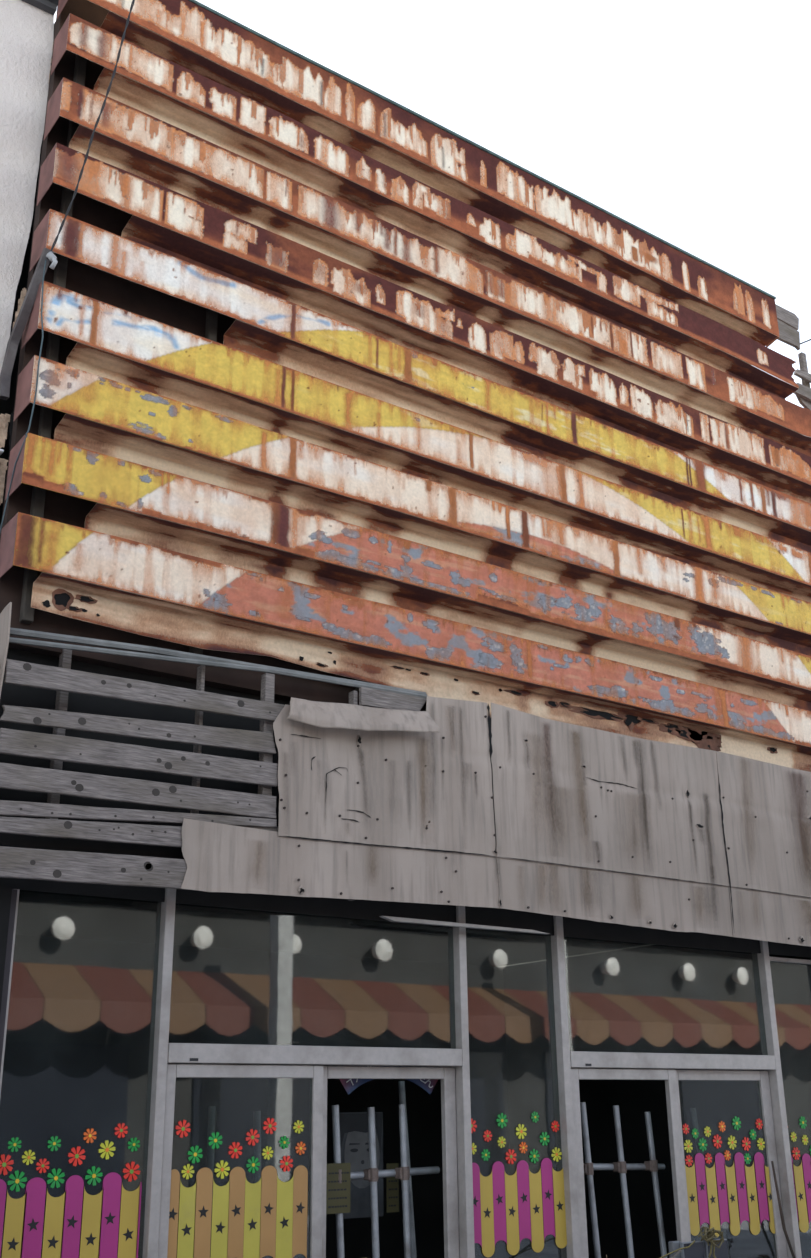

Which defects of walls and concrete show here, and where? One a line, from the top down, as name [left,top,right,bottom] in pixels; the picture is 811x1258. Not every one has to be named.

peeling [309,528,517,602]
peeling [683,573,775,598]
peeling [408,613,452,661]
peeling [479,637,524,674]
peeling [550,654,594,670]
peeling [538,594,730,658]
peeling [588,685,794,740]